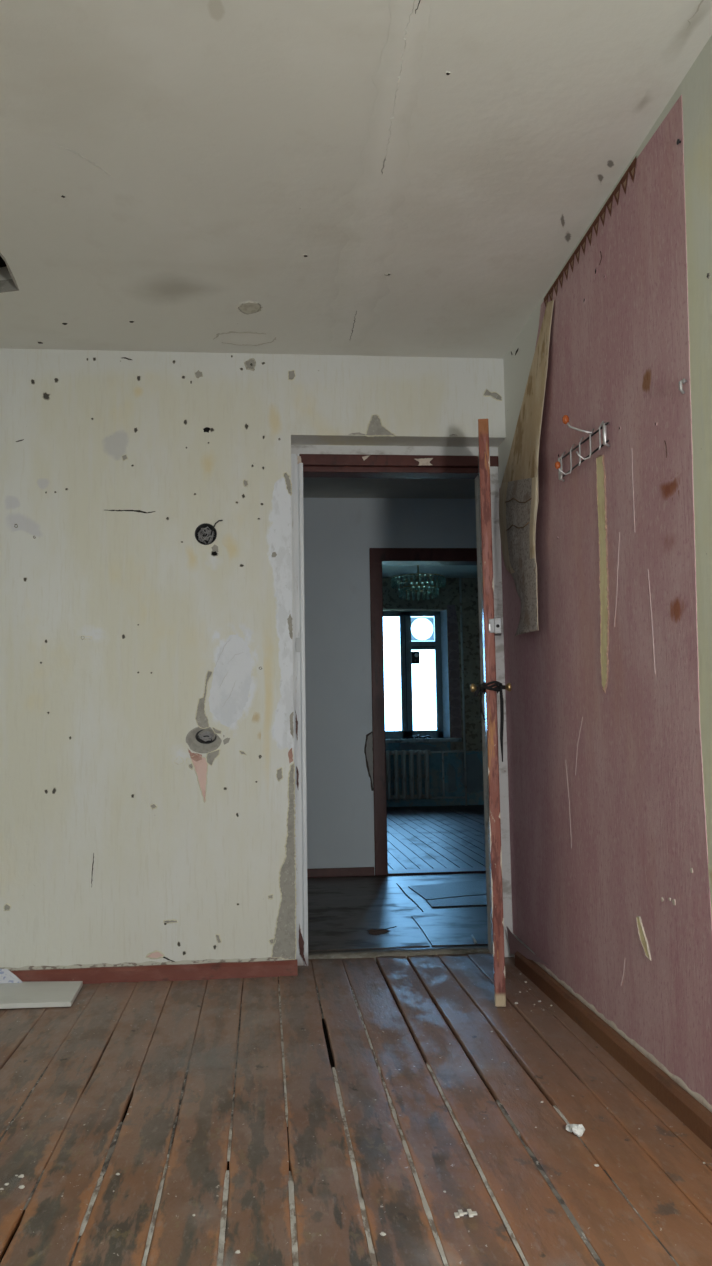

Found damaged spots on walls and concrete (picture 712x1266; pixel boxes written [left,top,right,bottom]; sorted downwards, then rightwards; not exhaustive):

spalling [348,414,396,437]
spalling [283,456,302,496]
spalling [287,614,302,652]
spalling [186,670,247,803]
spalling [0,710,307,971]